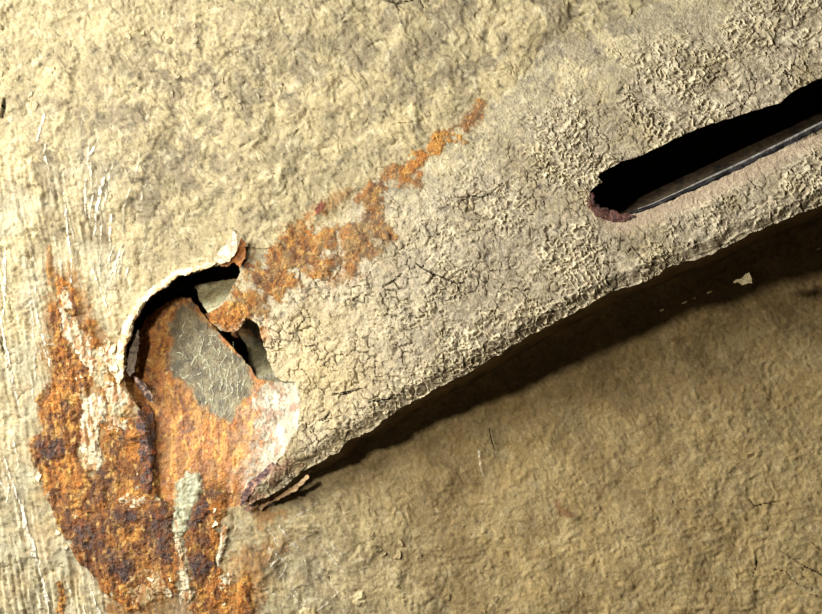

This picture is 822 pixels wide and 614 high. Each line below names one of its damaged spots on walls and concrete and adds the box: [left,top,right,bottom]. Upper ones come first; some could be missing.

corrosion [206,98,487,339]
crack [382,263,464,296]
peeling [57,287,140,472]
crack [319,388,395,421]
corrosion [29,275,254,614]
peeling [118,486,145,508]
peeling [126,471,204,607]
peeling [212,508,229,566]
peeling [218,572,233,590]